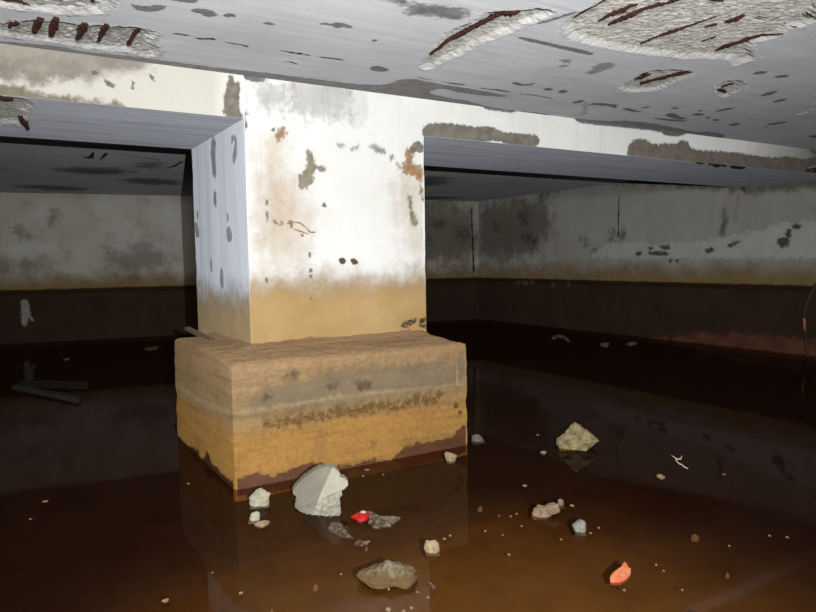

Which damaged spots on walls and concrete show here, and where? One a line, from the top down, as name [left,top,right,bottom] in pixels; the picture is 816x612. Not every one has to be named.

spalling [0,0,816,130]
peeling [409,123,540,153]
peeling [572,100,816,173]
corrosion [403,150,424,200]
water stain [636,245,678,262]
water stain [778,223,800,248]
water stain [0,267,816,345]